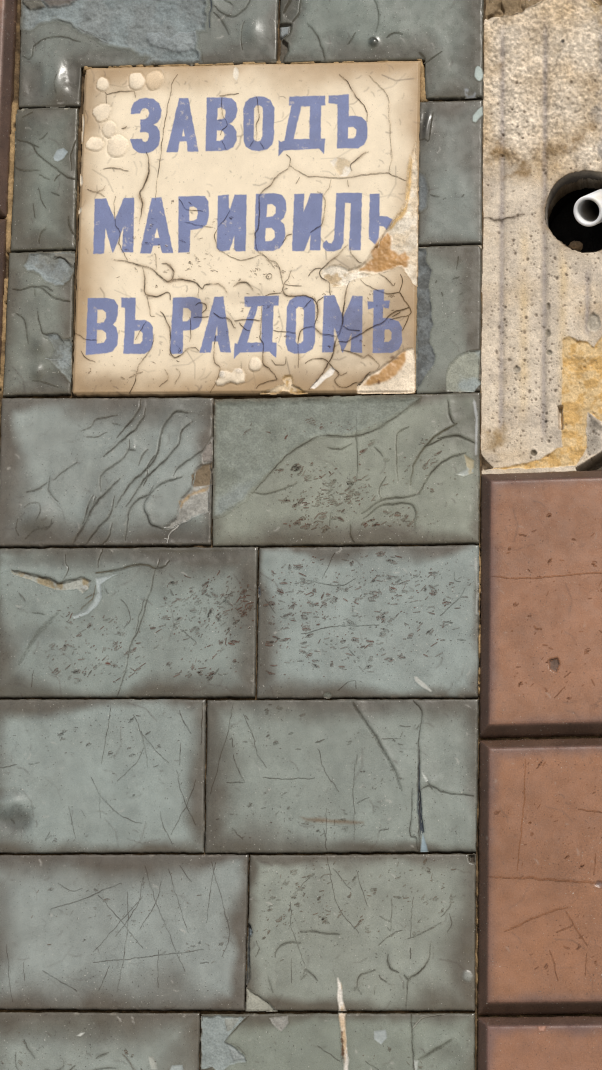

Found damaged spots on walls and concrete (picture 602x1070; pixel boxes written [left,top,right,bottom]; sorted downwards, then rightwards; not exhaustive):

spalling [20,0,210,66]
peeling [161,0,602,530]
crack [11,0,475,696]
spalling [11,571,120,619]
crack [353,700,474,851]
peeling [224,987,290,1062]